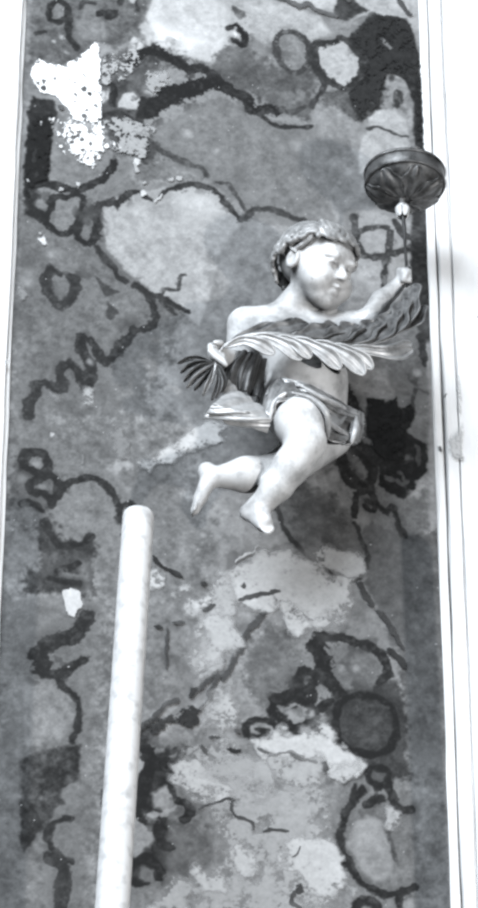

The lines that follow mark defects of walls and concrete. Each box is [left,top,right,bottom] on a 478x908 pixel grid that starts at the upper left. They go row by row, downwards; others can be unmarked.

peeling [31,42,156,172]
peeling [145,63,169,93]